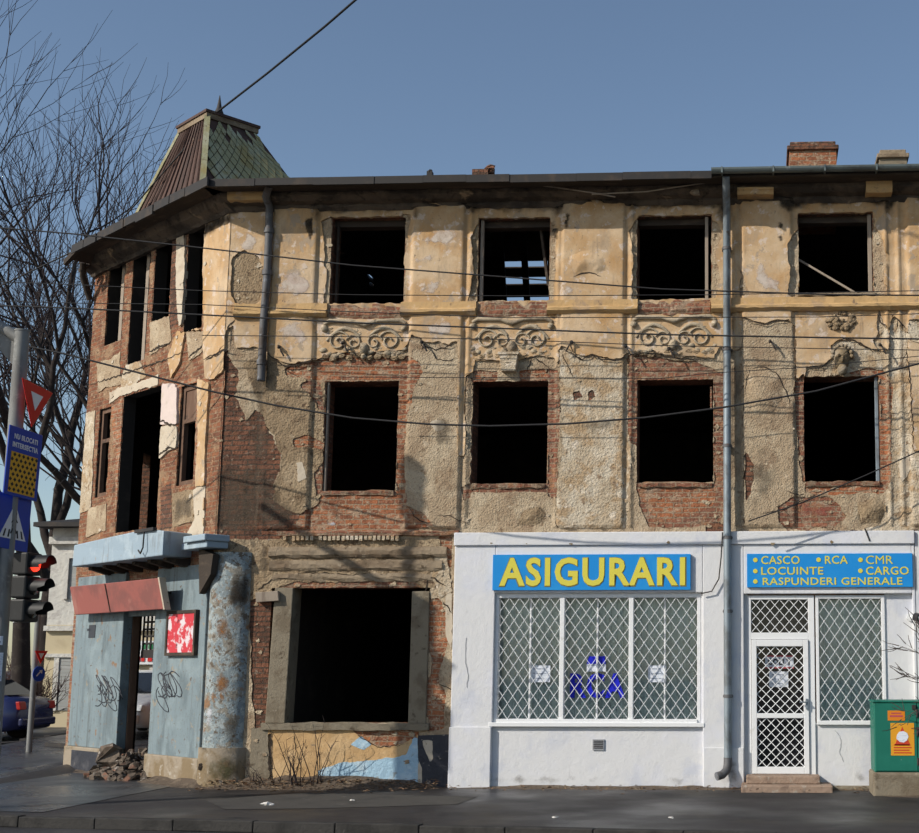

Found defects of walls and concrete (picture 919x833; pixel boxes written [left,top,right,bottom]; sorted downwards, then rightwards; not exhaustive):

flaking render [170,240,182,346]
flaking render [110,394,123,530]
flaking render [195,401,204,468]
flaking render [214,311,919,783]